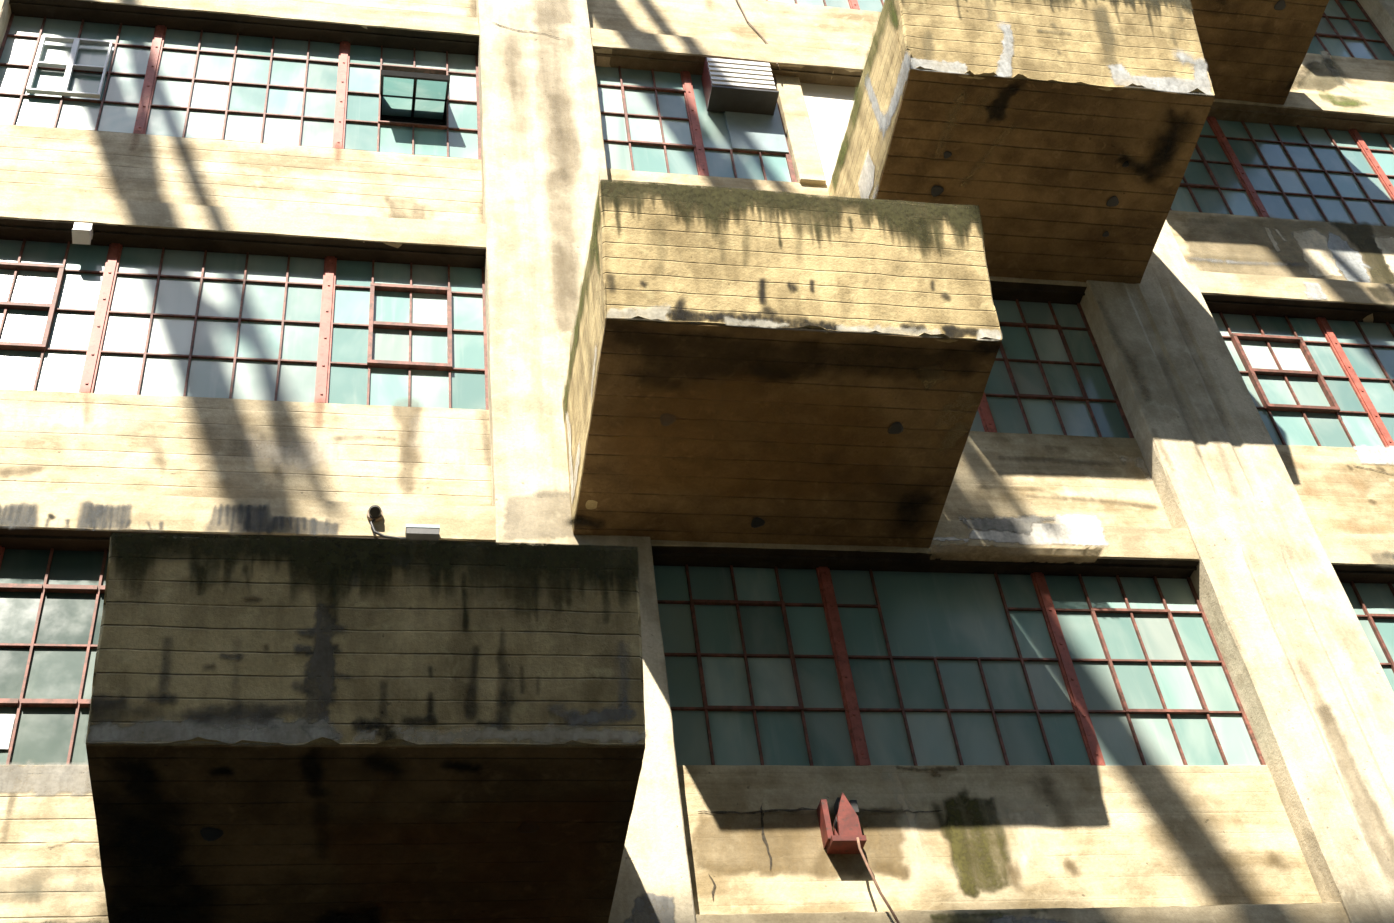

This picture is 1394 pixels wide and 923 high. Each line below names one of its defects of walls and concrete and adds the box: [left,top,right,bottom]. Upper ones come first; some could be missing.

water stain [352,694,436,741]
water stain [465,646,523,729]